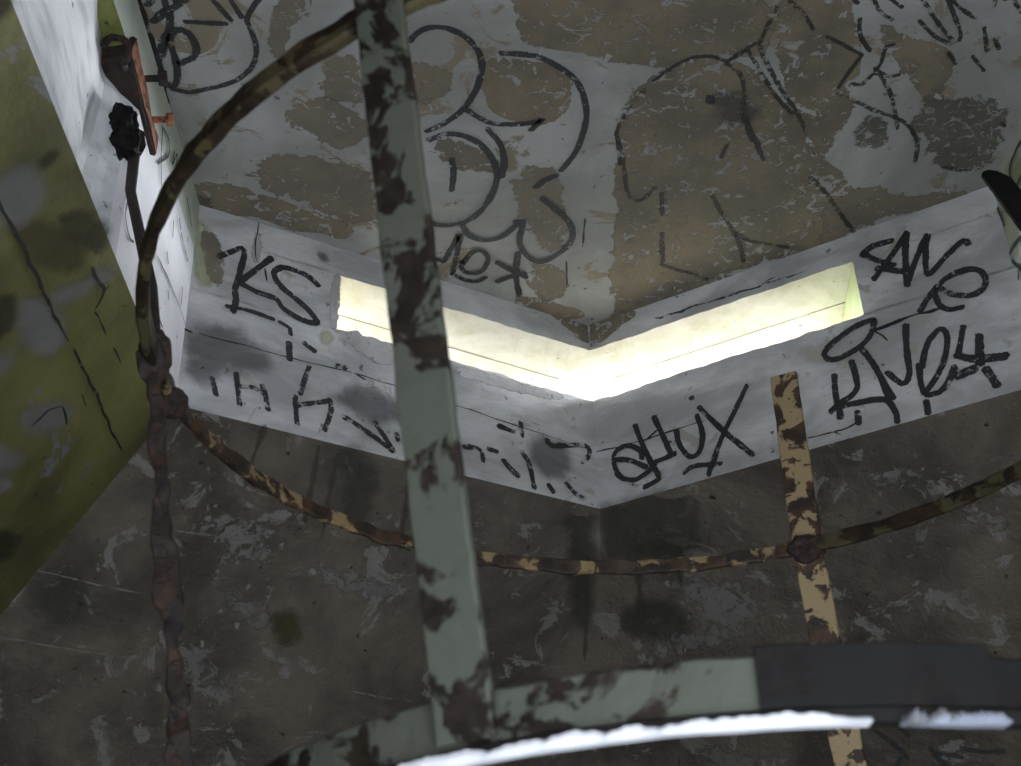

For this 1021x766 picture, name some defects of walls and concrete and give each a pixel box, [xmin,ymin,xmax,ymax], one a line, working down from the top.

peeling [412,60,453,110]
peeling [194,54,378,239]
peeling [434,137,500,174]